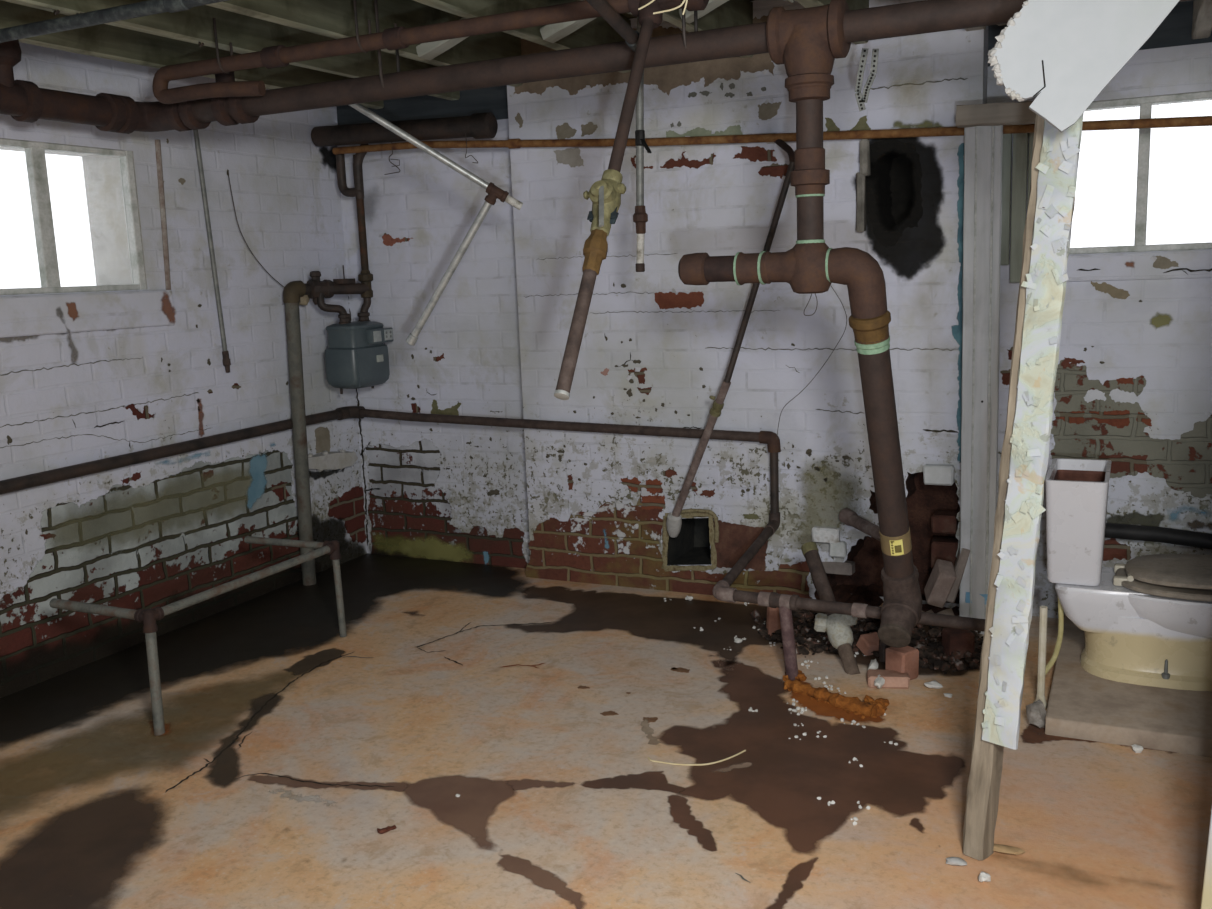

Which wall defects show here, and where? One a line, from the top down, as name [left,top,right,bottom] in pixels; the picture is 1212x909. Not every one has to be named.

peeling [554,122,598,168]
peeling [514,53,782,120]
peeling [825,116,871,132]
peeling [1021,127,1080,311]
peeling [0,450,301,663]
leakage [0,515,965,909]
peeling [328,385,884,607]
leakage [805,466,853,541]
spalling [906,472,960,616]
leakage [915,624,982,676]
peeling [981,545,1028,728]
peeling [1000,336,1212,523]